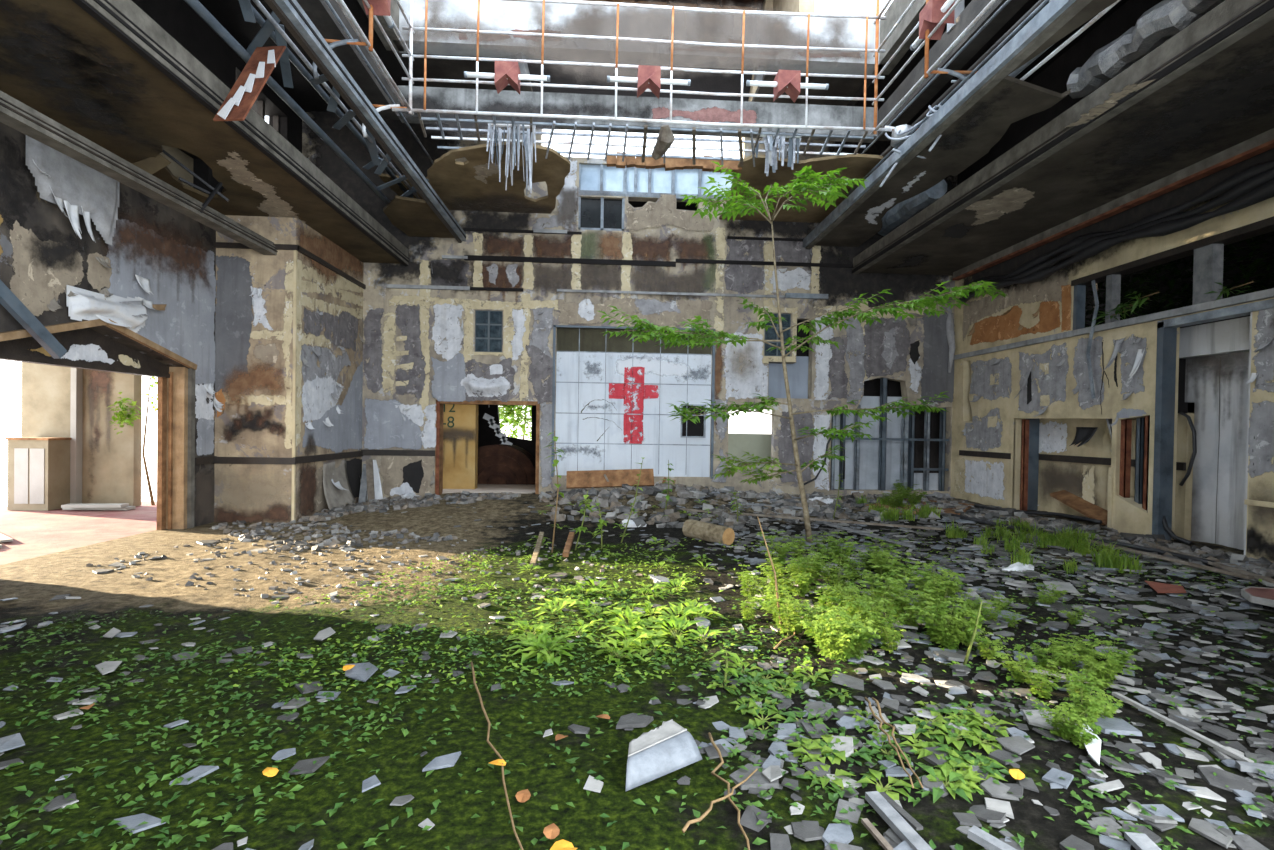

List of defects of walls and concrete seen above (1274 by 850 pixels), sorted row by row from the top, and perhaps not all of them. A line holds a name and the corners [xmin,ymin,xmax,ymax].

peeling [32,159,96,243]
peeling [47,284,167,328]
peeling [28,344,141,368]